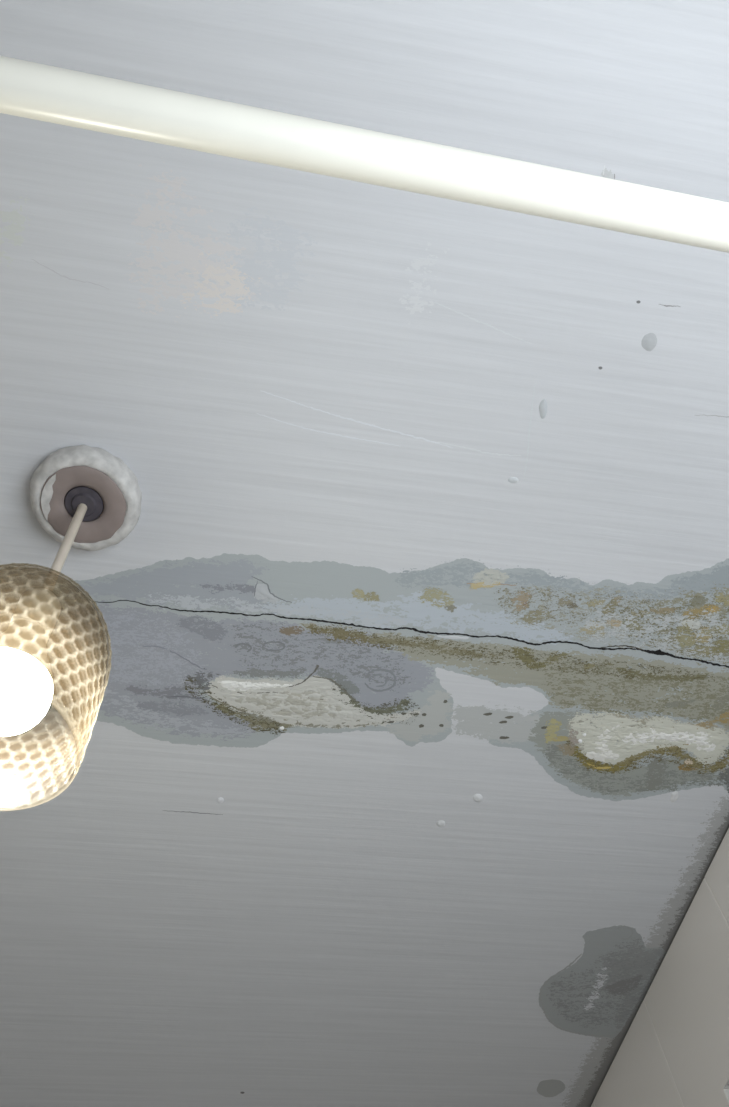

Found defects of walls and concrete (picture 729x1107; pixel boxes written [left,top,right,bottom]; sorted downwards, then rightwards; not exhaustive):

crack [92,576,729,668]
corrosion [469,580,729,668]
peeling [206,675,421,729]
leakage [46,553,729,801]
peeling [568,711,729,768]
leakage [539,925,667,1039]